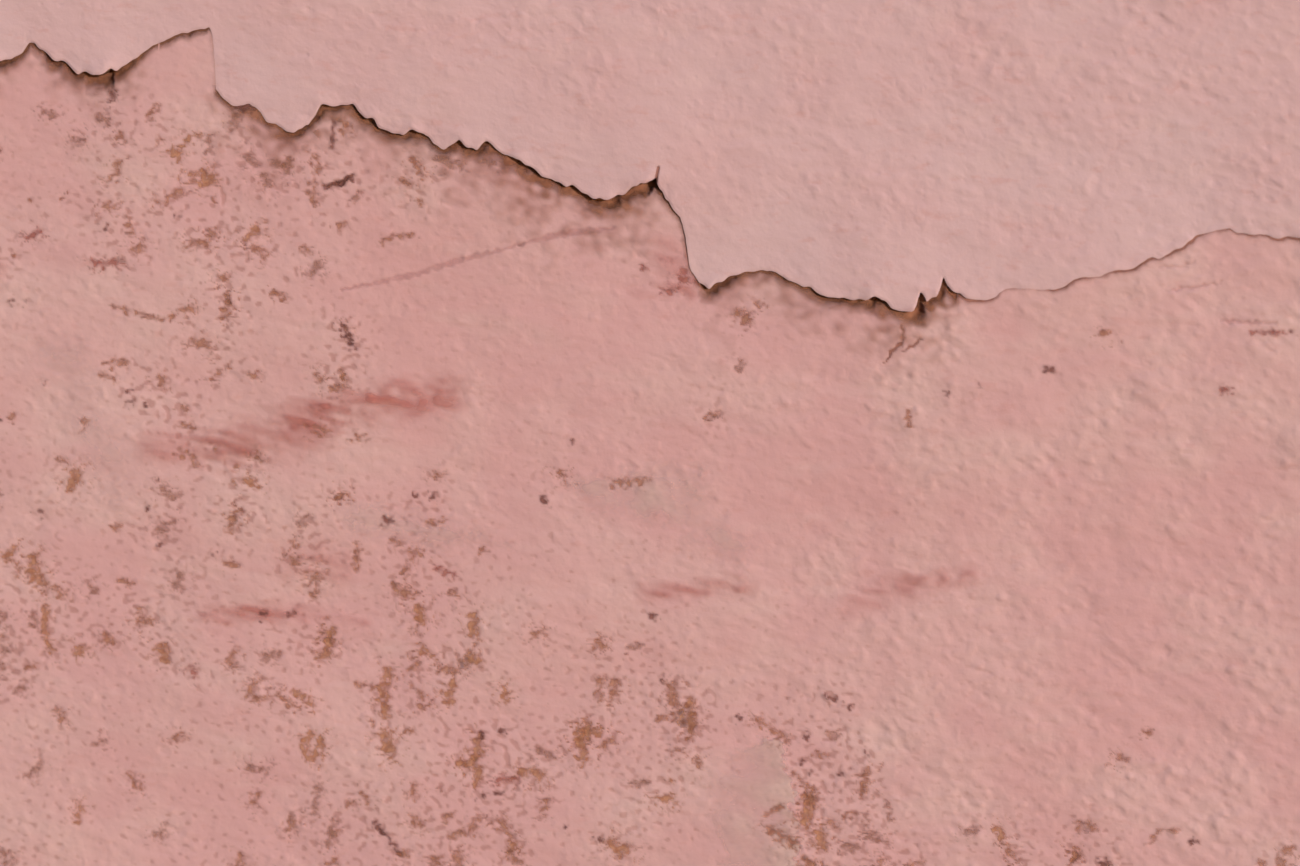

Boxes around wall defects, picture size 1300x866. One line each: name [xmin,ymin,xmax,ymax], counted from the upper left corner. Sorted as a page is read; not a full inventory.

flaking render [0,16,974,312]
peeling [57,457,81,492]
peeling [2,545,63,654]
peeling [391,548,425,626]
peeling [408,612,482,710]
peeling [300,730,330,762]
peeling [354,667,414,763]
peeling [373,821,410,857]
peeling [456,728,555,798]
peeling [573,718,614,768]
peeling [656,679,700,768]
peeling [764,735,889,866]